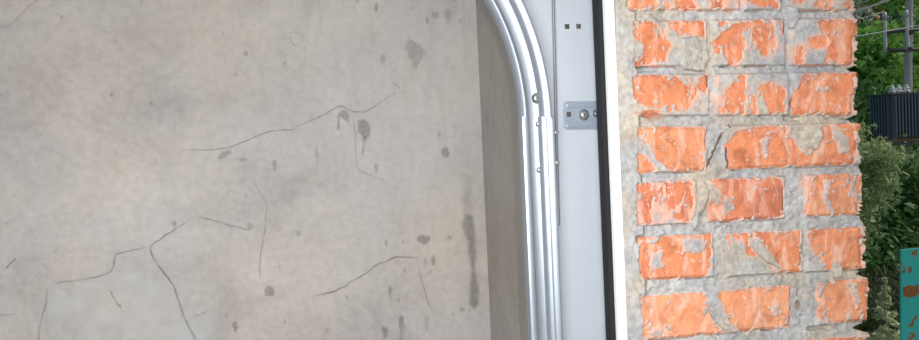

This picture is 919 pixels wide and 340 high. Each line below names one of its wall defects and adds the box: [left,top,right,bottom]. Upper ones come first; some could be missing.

crack [706,124,731,169]